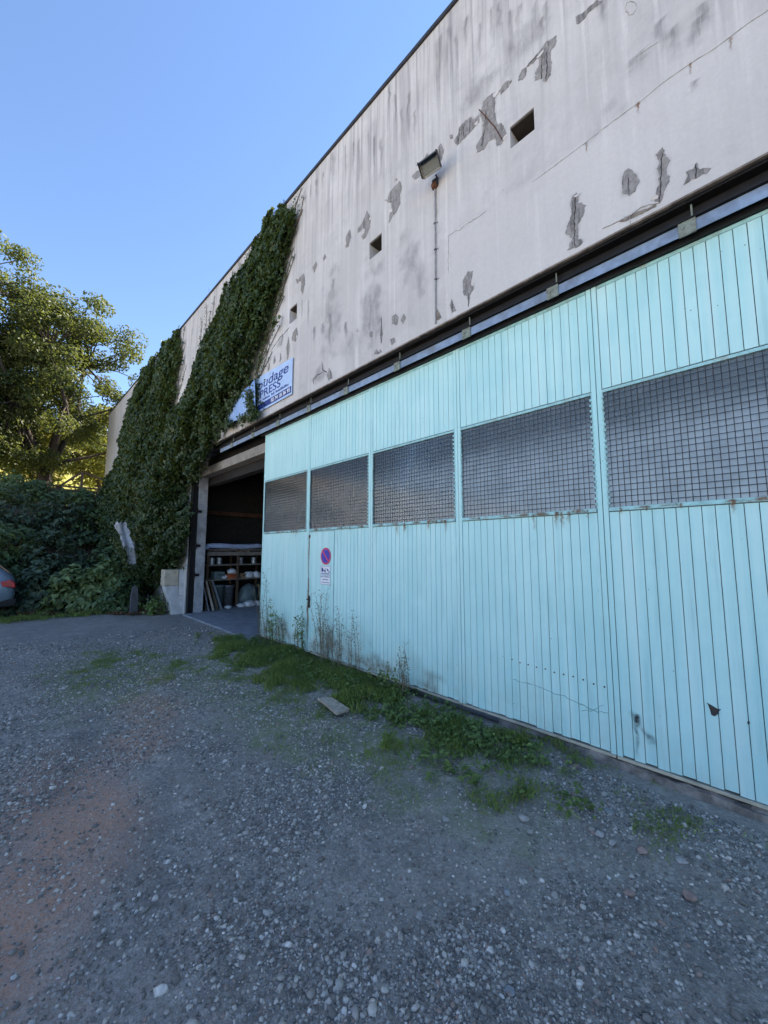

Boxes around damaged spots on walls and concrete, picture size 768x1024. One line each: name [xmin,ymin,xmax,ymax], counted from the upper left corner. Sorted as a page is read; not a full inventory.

peeling [575,0,603,24]
peeling [425,35,557,161]
crack [532,10,768,182]
peeling [345,211,371,248]
peeling [385,170,421,222]
peeling [565,193,586,250]
peeling [603,147,670,229]
peeling [684,162,711,185]
peeling [462,271,474,306]